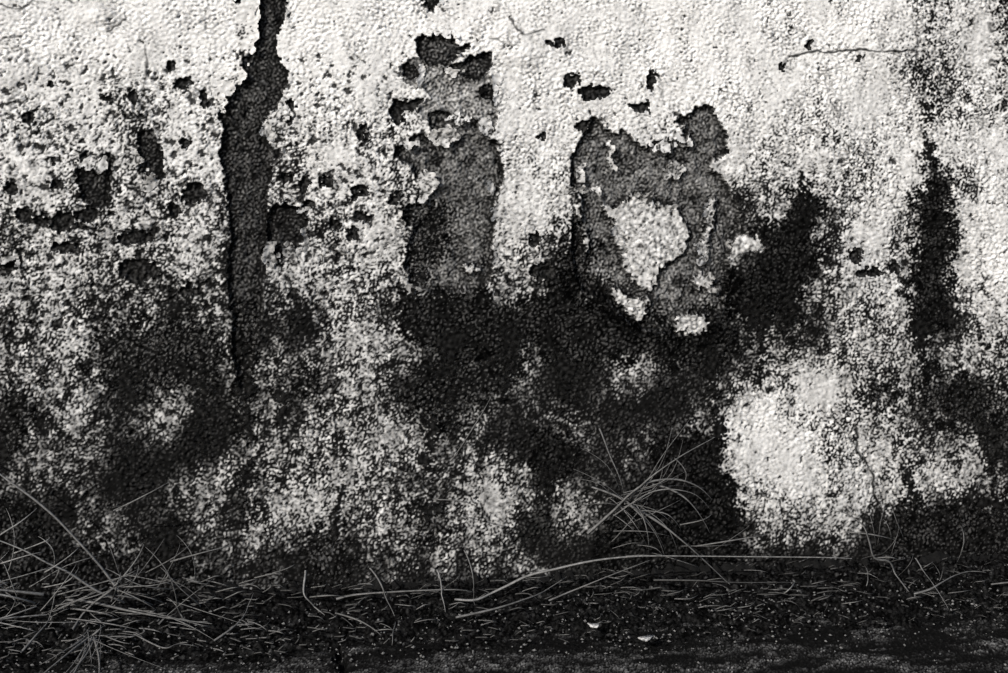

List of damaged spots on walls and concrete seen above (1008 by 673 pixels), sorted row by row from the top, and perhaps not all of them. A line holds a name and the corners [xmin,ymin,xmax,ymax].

peeling [3,150,116,254]
damp [0,381,211,602]
peeling [99,88,138,105]
peeling [111,224,160,285]
peeling [128,127,166,192]
damp [76,300,320,537]
damp [300,452,356,590]
peeling [387,28,506,294]
damp [394,168,829,574]
peeling [563,104,741,337]
crack [789,48,917,57]
damp [853,0,1008,560]